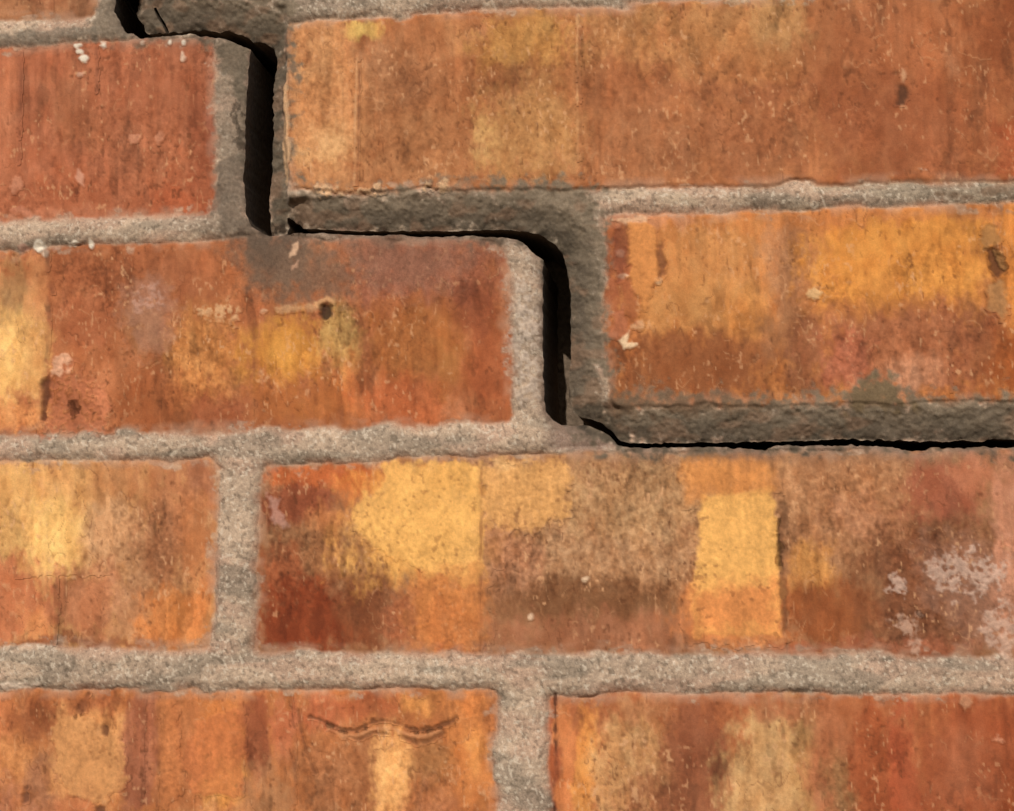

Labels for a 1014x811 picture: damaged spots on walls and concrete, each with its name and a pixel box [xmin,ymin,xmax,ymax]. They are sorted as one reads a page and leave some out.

crack [114,0,1014,451]
crack [477,460,485,653]